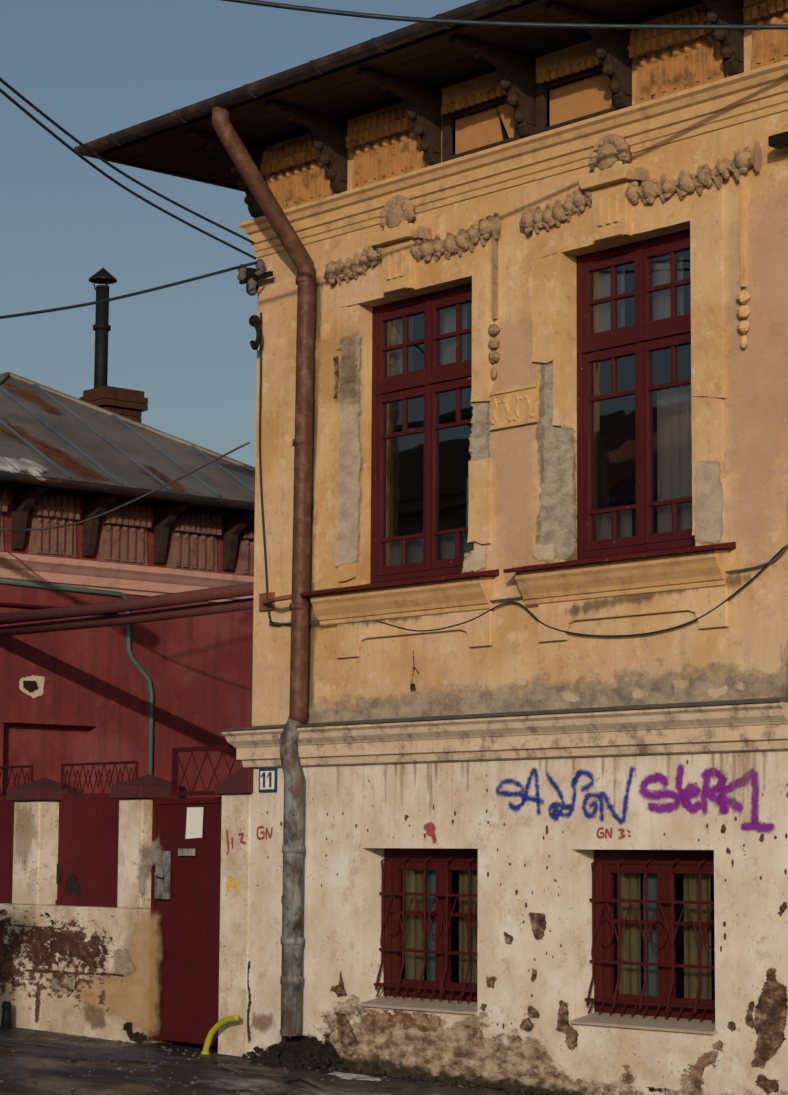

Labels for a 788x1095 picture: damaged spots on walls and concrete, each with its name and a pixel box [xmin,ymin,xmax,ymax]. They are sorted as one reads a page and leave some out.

corrosion [4,382,63,415]
corrosion [0,418,108,480]
water stain [311,279,321,533]
flaking render [468,400,491,461]
flaking render [533,363,577,560]
flaking render [463,546,487,572]
flaking render [19,675,45,698]
water stain [306,548,788,723]
peeling [0,904,136,1013]
flaking render [515,890,551,940]
flaking render [317,944,724,1095]
flaking render [727,968,788,1095]